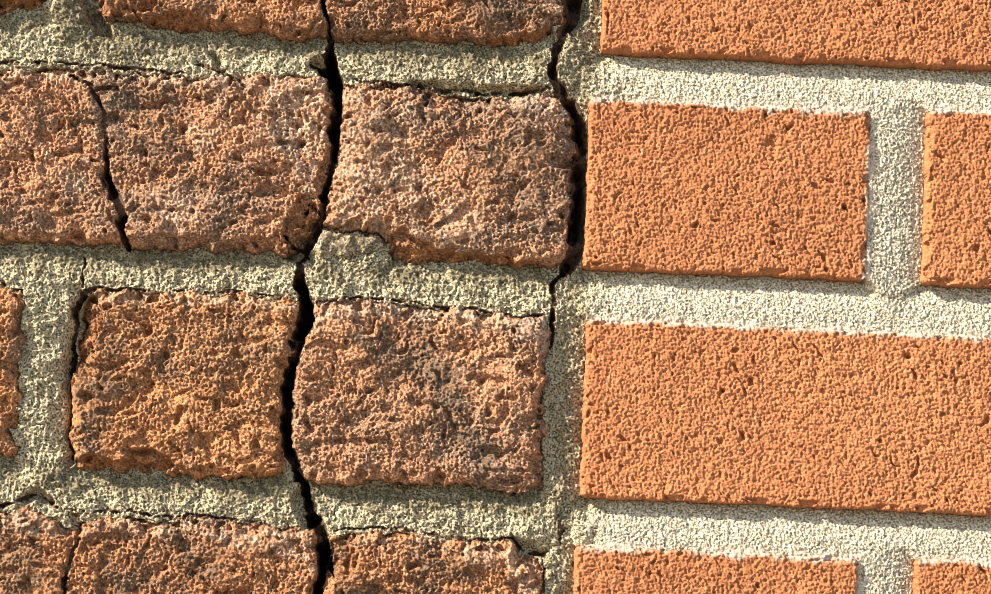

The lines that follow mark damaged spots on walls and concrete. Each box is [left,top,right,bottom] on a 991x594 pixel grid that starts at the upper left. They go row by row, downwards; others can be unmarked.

crack [0,0,587,594]